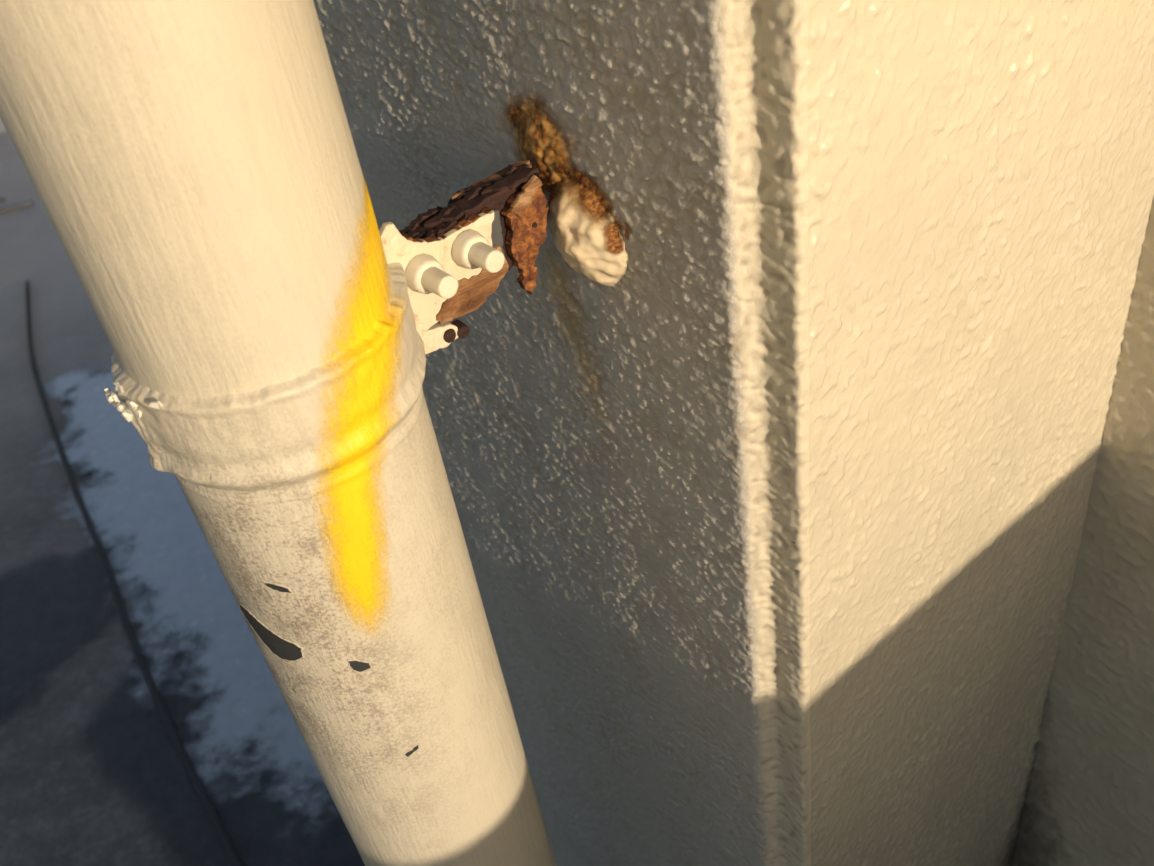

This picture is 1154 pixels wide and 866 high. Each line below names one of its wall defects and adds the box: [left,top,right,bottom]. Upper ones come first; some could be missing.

corrosion [403,221,447,239]
corrosion [436,100,630,324]
leakage [0,543,114,718]